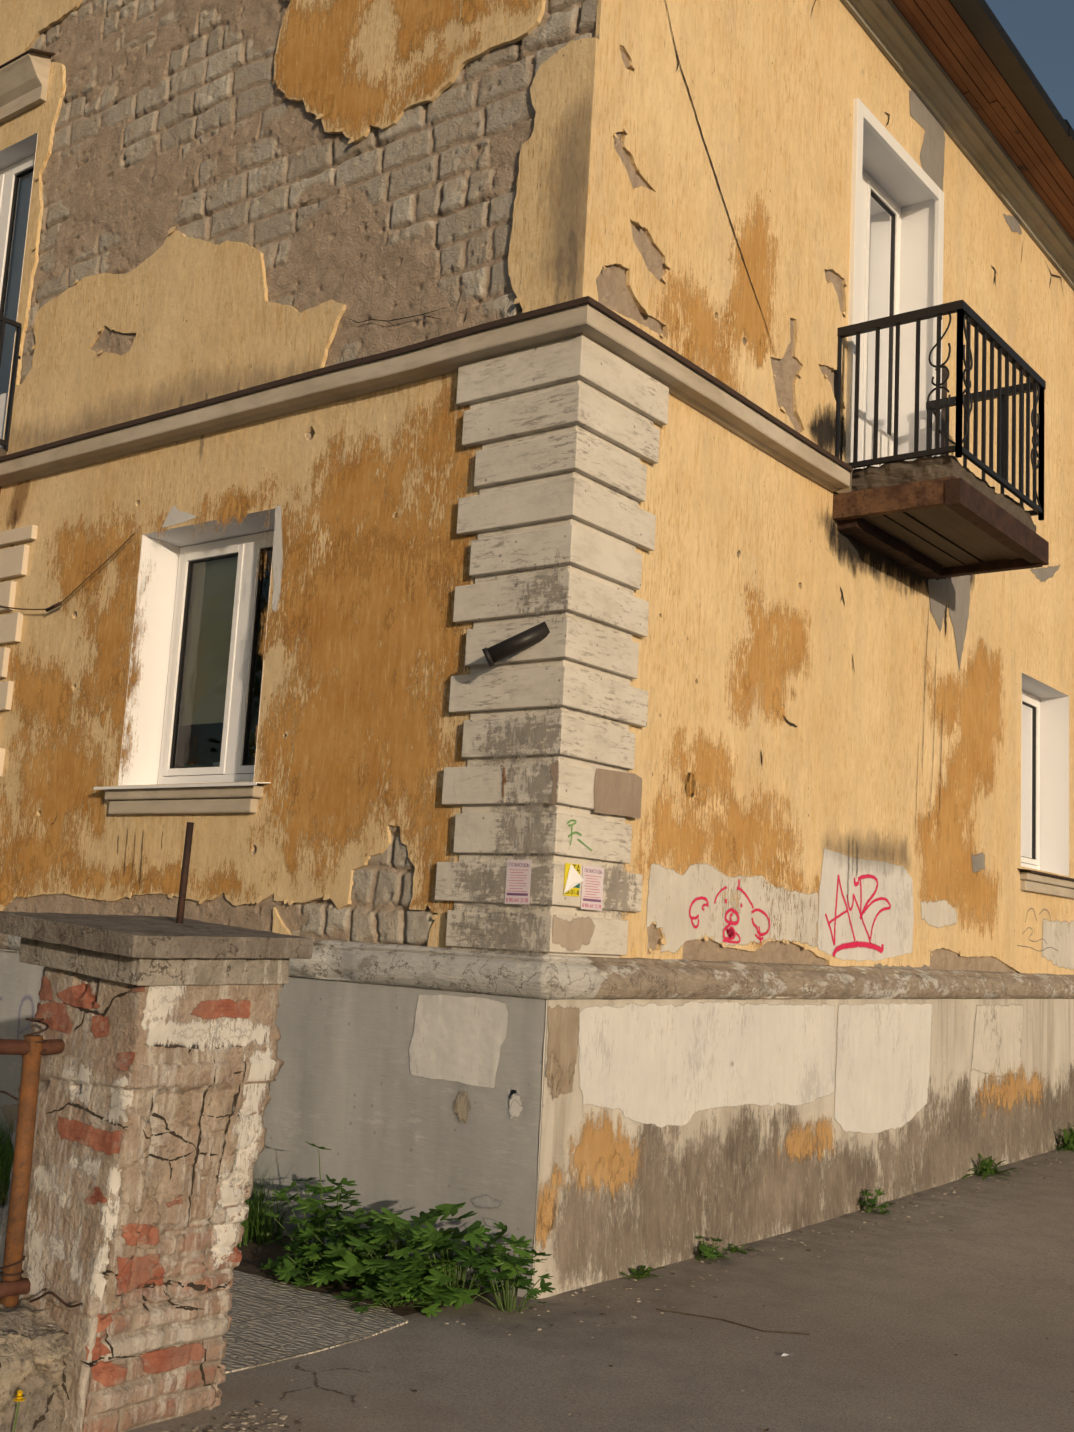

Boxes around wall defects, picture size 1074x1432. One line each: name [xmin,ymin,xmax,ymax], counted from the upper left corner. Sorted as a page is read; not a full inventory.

spalling [20,0,599,384]
crack [665,0,774,351]
peeling [596,198,802,432]
peeling [0,375,826,965]
peeling [916,639,1017,973]
crack [56,985,136,1030]
flaking render [85,1186,165,1295]
flaking render [85,1313,205,1387]
crack [46,1044,249,1226]
flaking render [191,999,251,1020]
peeling [545,1005,580,1099]
leakage [541,1063,1074,1288]